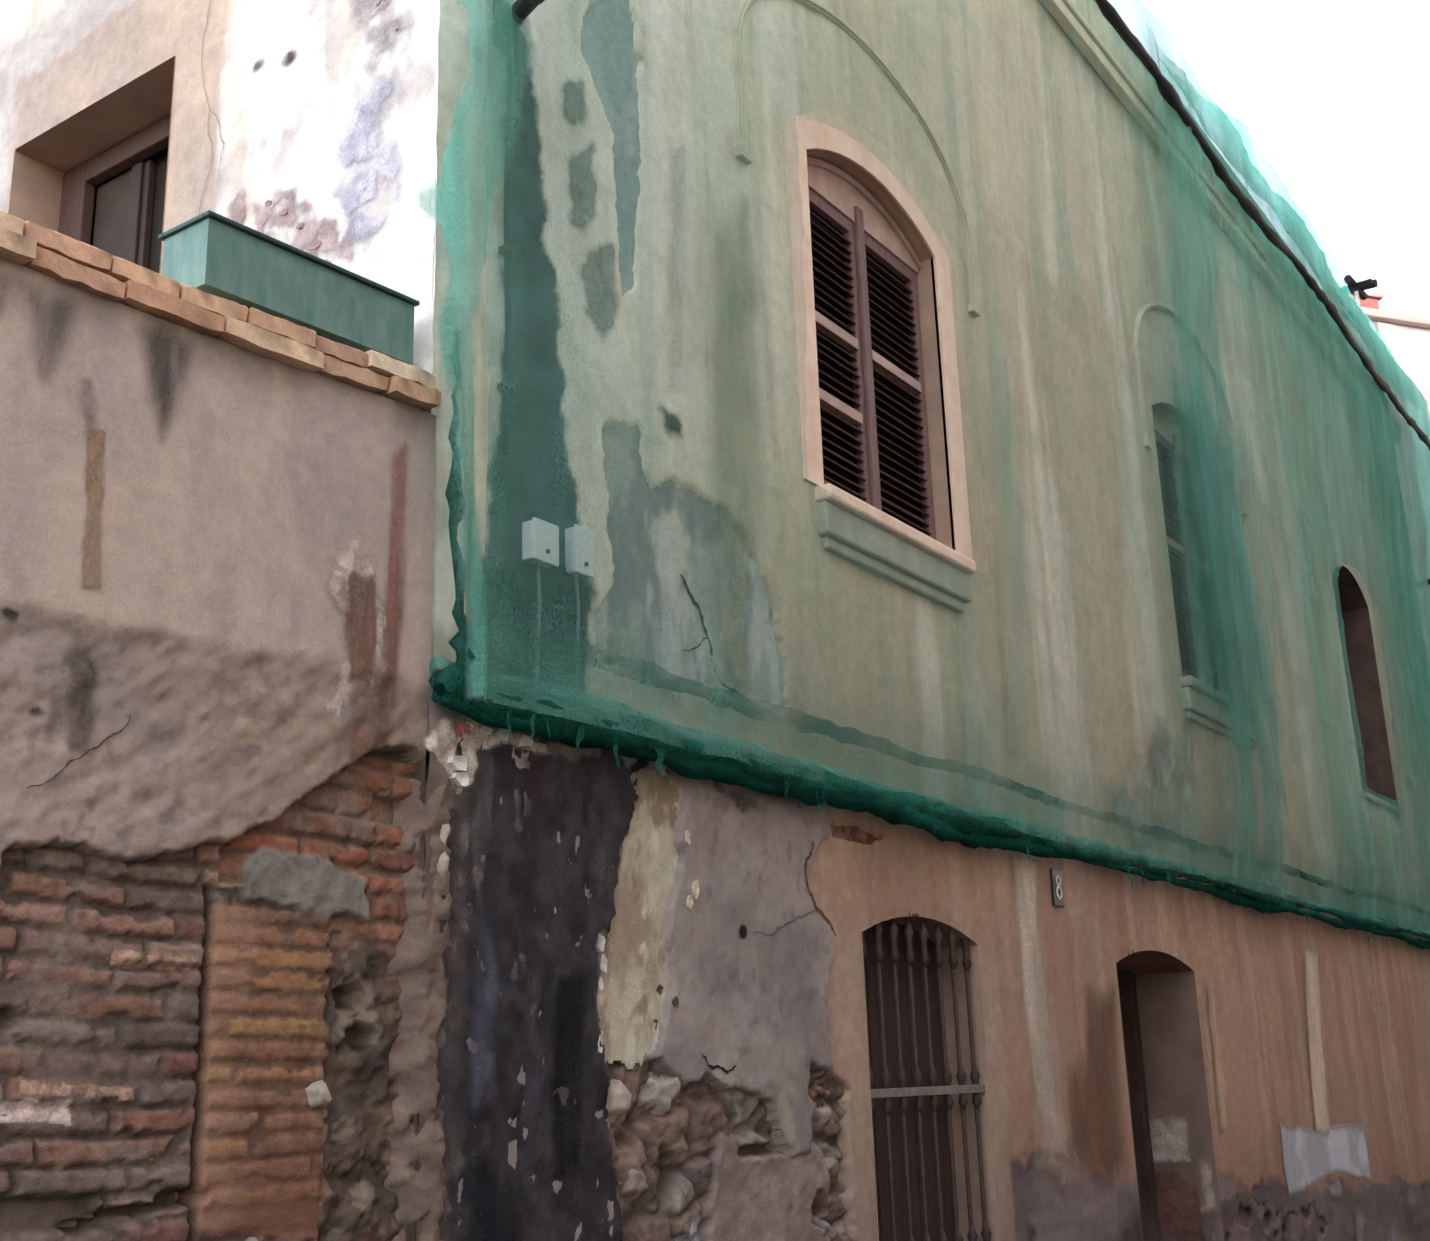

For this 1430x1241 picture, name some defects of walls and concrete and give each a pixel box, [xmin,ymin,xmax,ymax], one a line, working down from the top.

peeling [229,0,412,263]
peeling [593,424,785,712]
spalling [0,538,547,1241]
leakage [435,754,497,1240]
leakage [554,978,583,1173]
spalling [597,764,852,1241]
crack [754,841,836,936]
peeling [831,823,883,845]
spalling [1155,1171,1326,1241]